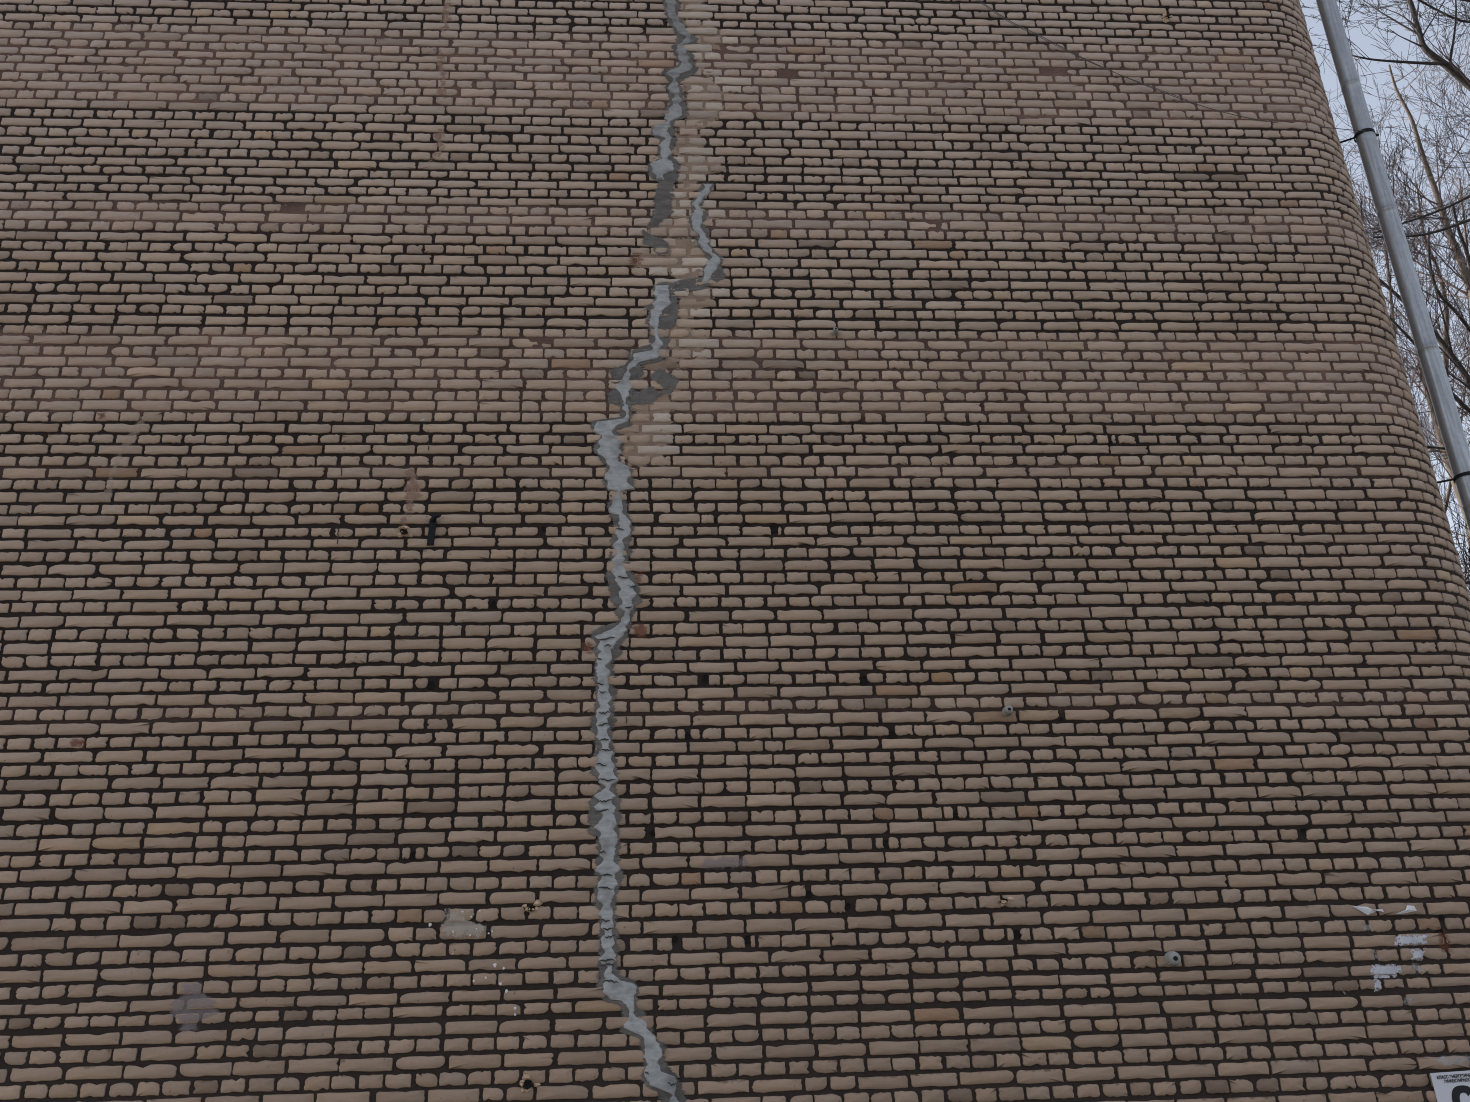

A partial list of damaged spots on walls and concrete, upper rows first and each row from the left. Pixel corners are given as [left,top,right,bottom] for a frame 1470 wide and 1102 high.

crack [587,0,726,1102]